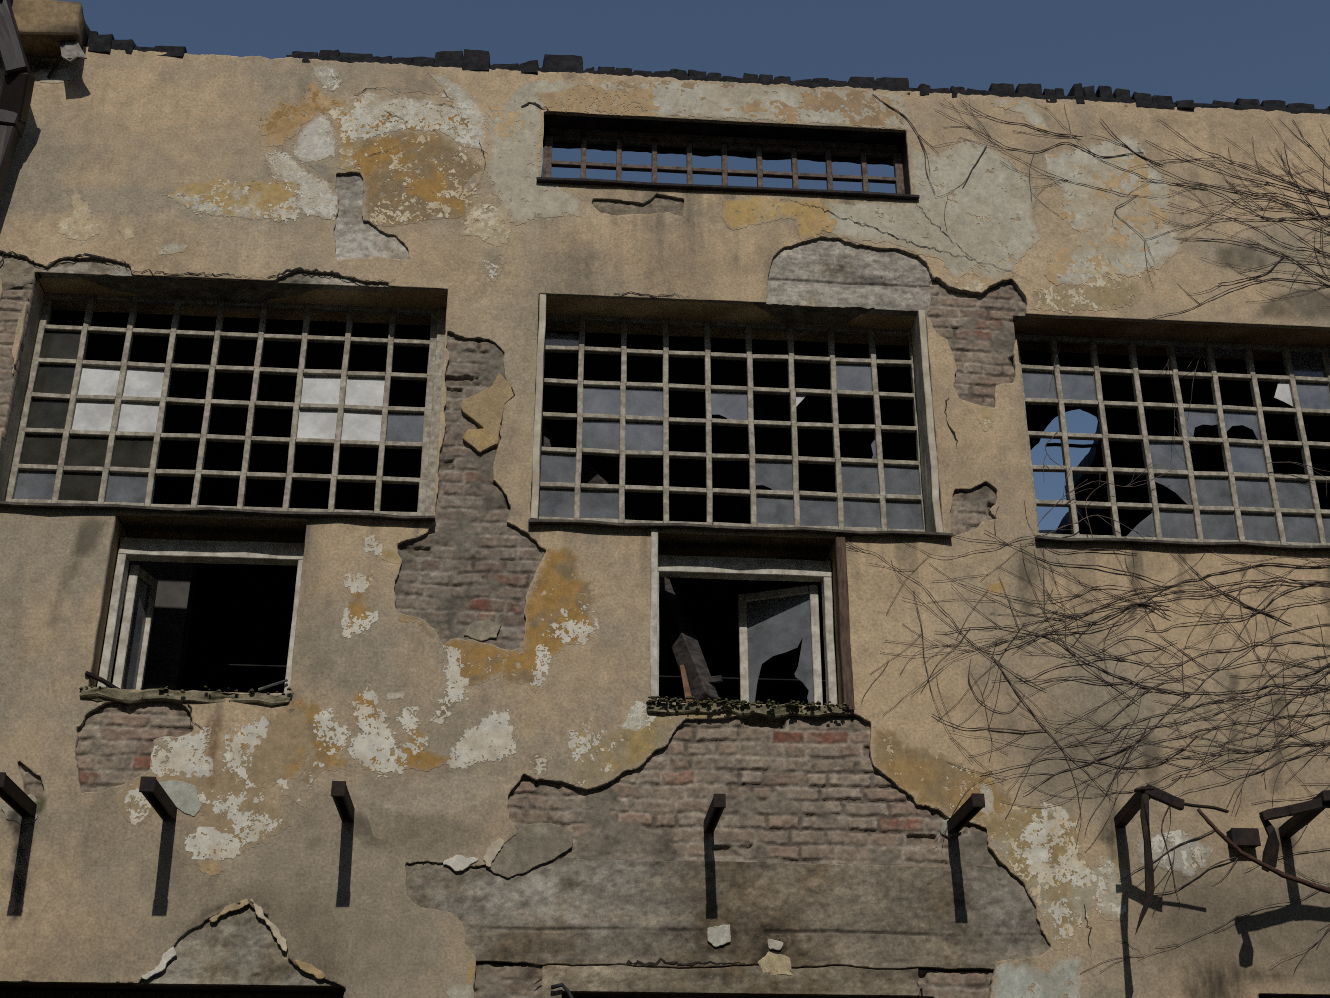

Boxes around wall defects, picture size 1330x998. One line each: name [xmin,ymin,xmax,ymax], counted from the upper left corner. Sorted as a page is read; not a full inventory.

peeling [0,63,913,441]
peeling [721,134,1184,408]
peeling [991,98,1051,135]
flaking render [76,333,600,876]
flaking render [950,483,996,537]
flaking render [132,904,346,993]
spalling [405,701,1214,998]